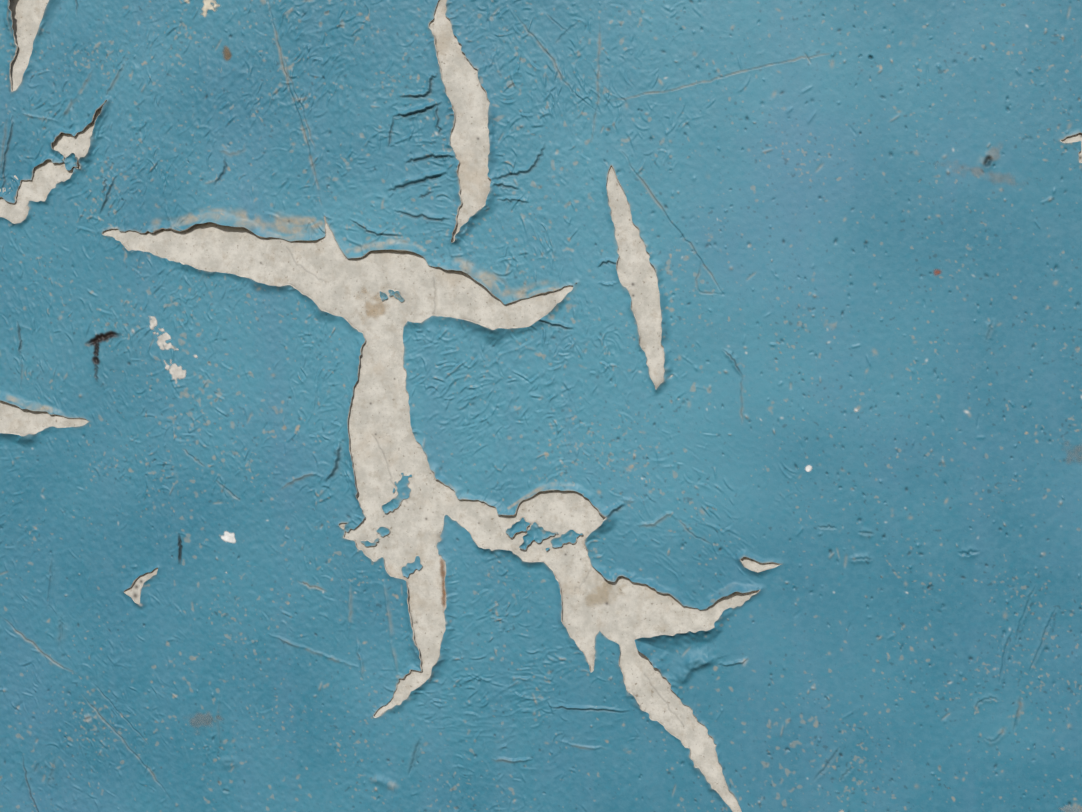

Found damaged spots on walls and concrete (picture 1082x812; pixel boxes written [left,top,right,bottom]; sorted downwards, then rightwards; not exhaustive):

peeling [1,0,64,98]
peeling [0,93,116,232]
crack [347,71,452,240]
peeling [1056,128,1082,169]
peeling [0,388,95,451]
peeling [98,0,789,812]